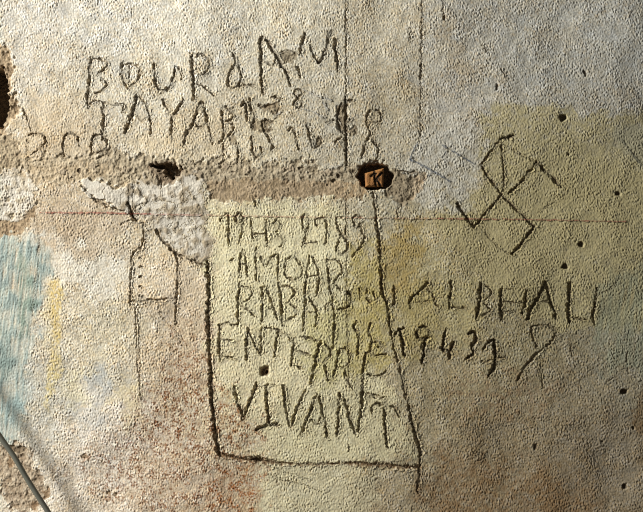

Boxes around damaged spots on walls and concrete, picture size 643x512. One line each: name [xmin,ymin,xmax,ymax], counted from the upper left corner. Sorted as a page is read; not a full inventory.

flaking render [0,43,427,269]